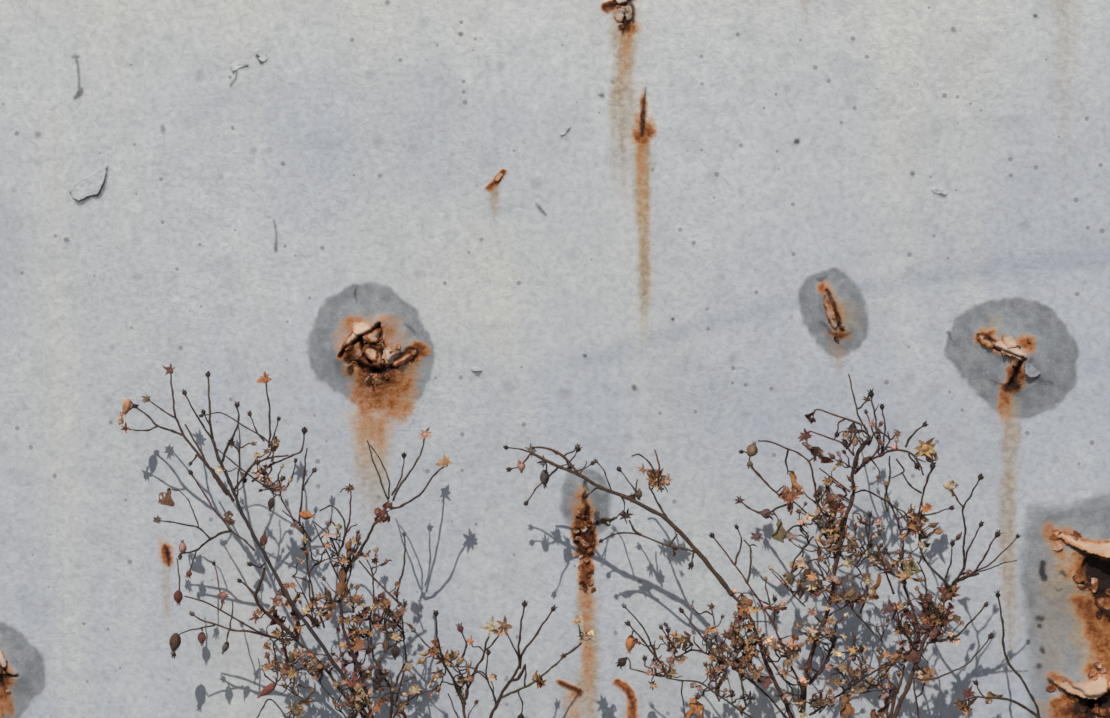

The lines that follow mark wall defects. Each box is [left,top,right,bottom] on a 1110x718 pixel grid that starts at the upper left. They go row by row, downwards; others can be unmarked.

corrosion [482,166,510,224]
corrosion [597,0,661,353]
corrosion [554,677,589,718]